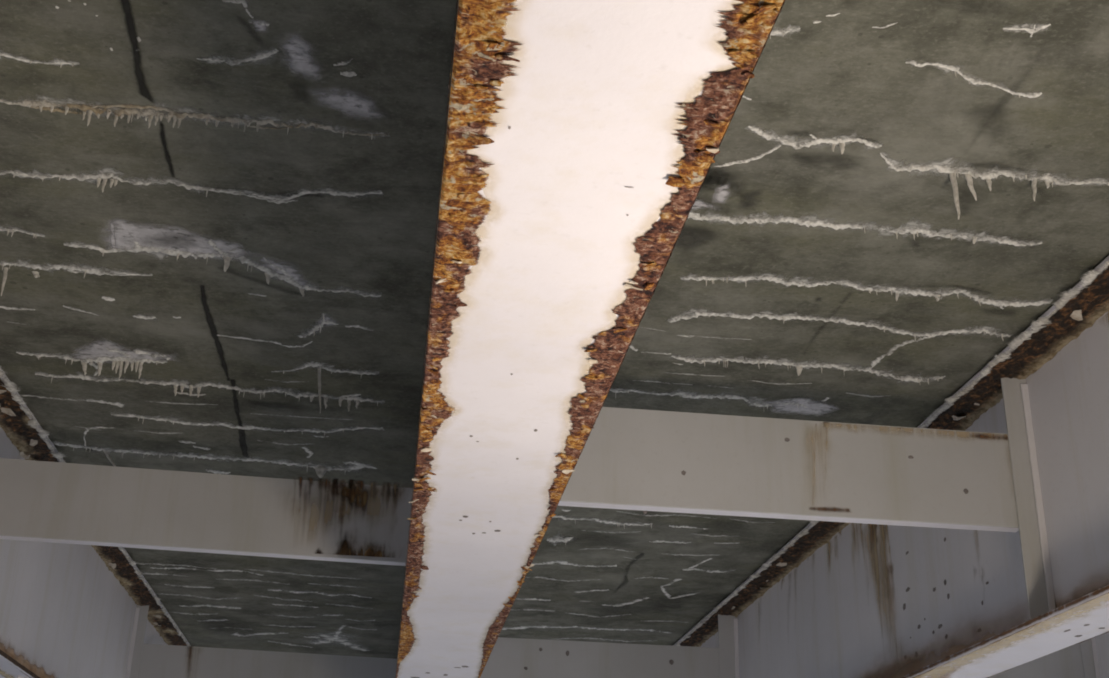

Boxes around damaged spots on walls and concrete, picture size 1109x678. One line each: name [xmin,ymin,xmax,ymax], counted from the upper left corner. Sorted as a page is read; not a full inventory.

crack [0,0,390,140]
crack [0,168,384,204]
damp [700,170,730,190]
corrosion [0,369,65,463]
crack [0,220,385,478]
corrosion [336,0,522,678]
corrosion [478,0,785,678]
corrosion [880,262,1109,439]
corrosion [299,477,399,528]
corrosion [91,545,192,659]
corrosion [676,508,892,647]
corrosion [892,585,1109,678]